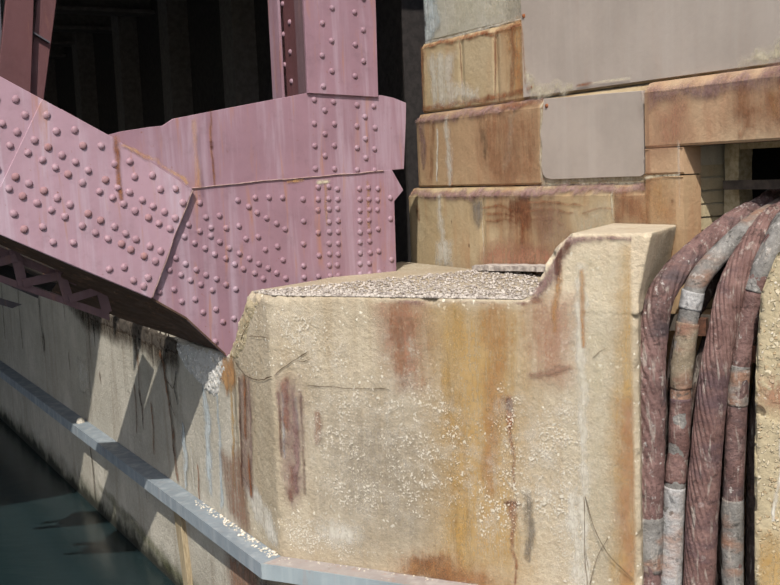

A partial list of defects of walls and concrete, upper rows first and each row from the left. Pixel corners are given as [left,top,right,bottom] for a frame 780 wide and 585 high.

rust [411,183,667,377]
leakage [71,307,178,367]
crack [235,326,310,398]
rust [385,300,424,379]
spalling [756,256,780,404]
rust [221,358,252,496]
rust [278,381,302,500]
rust [408,557,485,585]
crack [582,500,590,585]